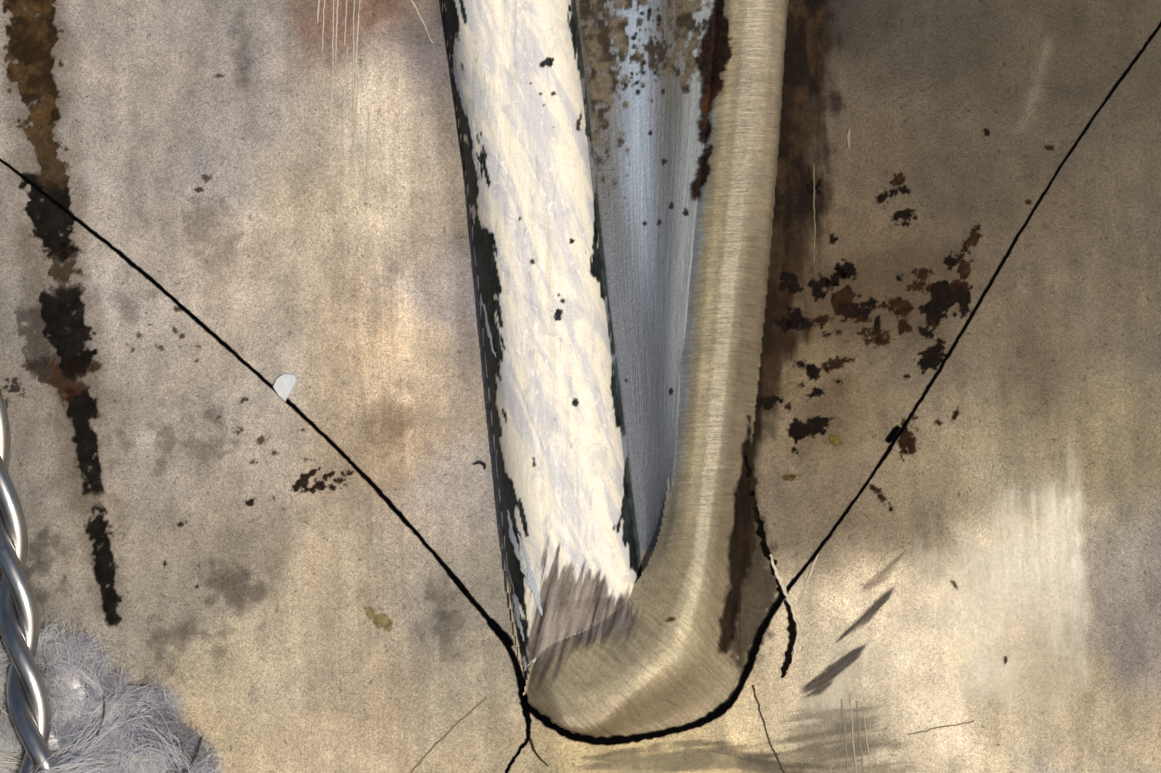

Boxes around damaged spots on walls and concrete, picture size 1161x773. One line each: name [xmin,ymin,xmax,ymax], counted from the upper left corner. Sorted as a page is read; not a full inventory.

rust [2,0,122,626]
crack [0,159,275,391]
peeling [441,0,638,683]
peeling [613,457,643,584]
rust [692,0,733,200]
crack [285,22,1161,773]
rust [719,0,982,669]